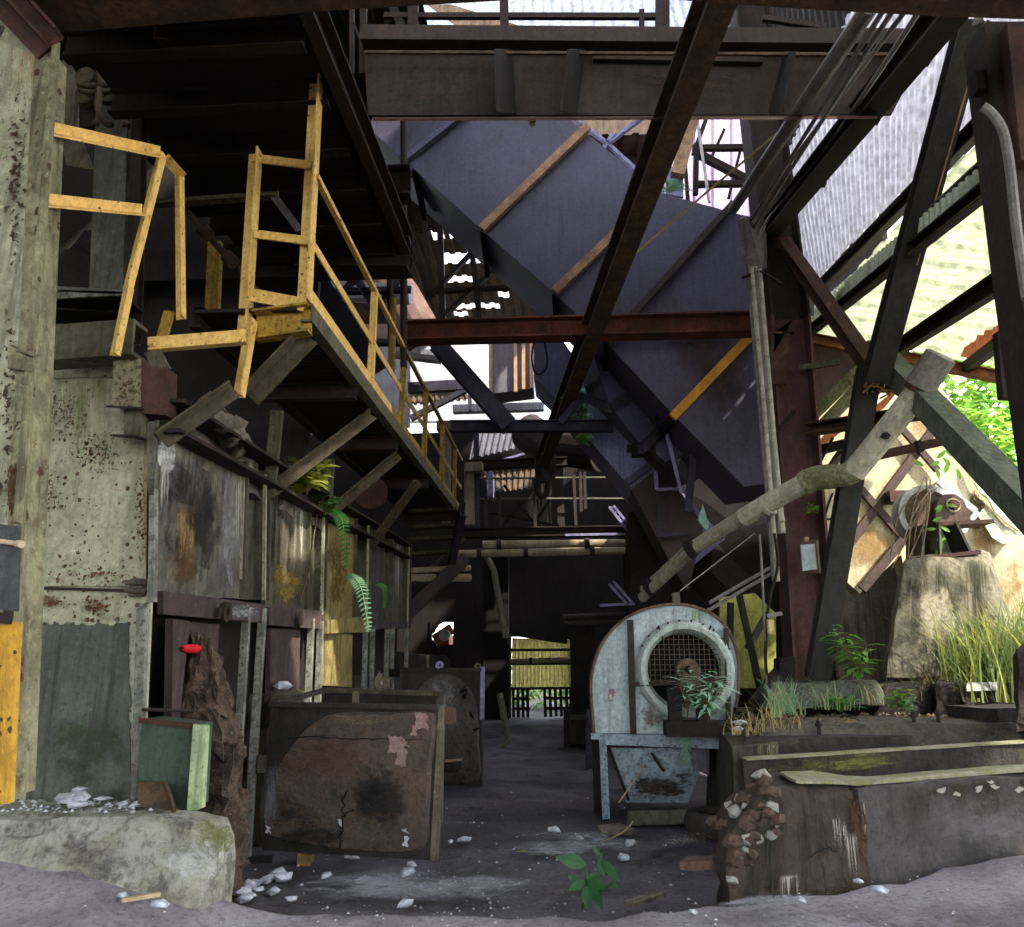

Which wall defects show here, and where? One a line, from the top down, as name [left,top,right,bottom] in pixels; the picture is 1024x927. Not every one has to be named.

corrosion [6,463,17,517]
corrosion [51,388,126,473]
corrosion [47,442,147,615]
leakage [158,442,176,501]
leakage [197,475,242,586]